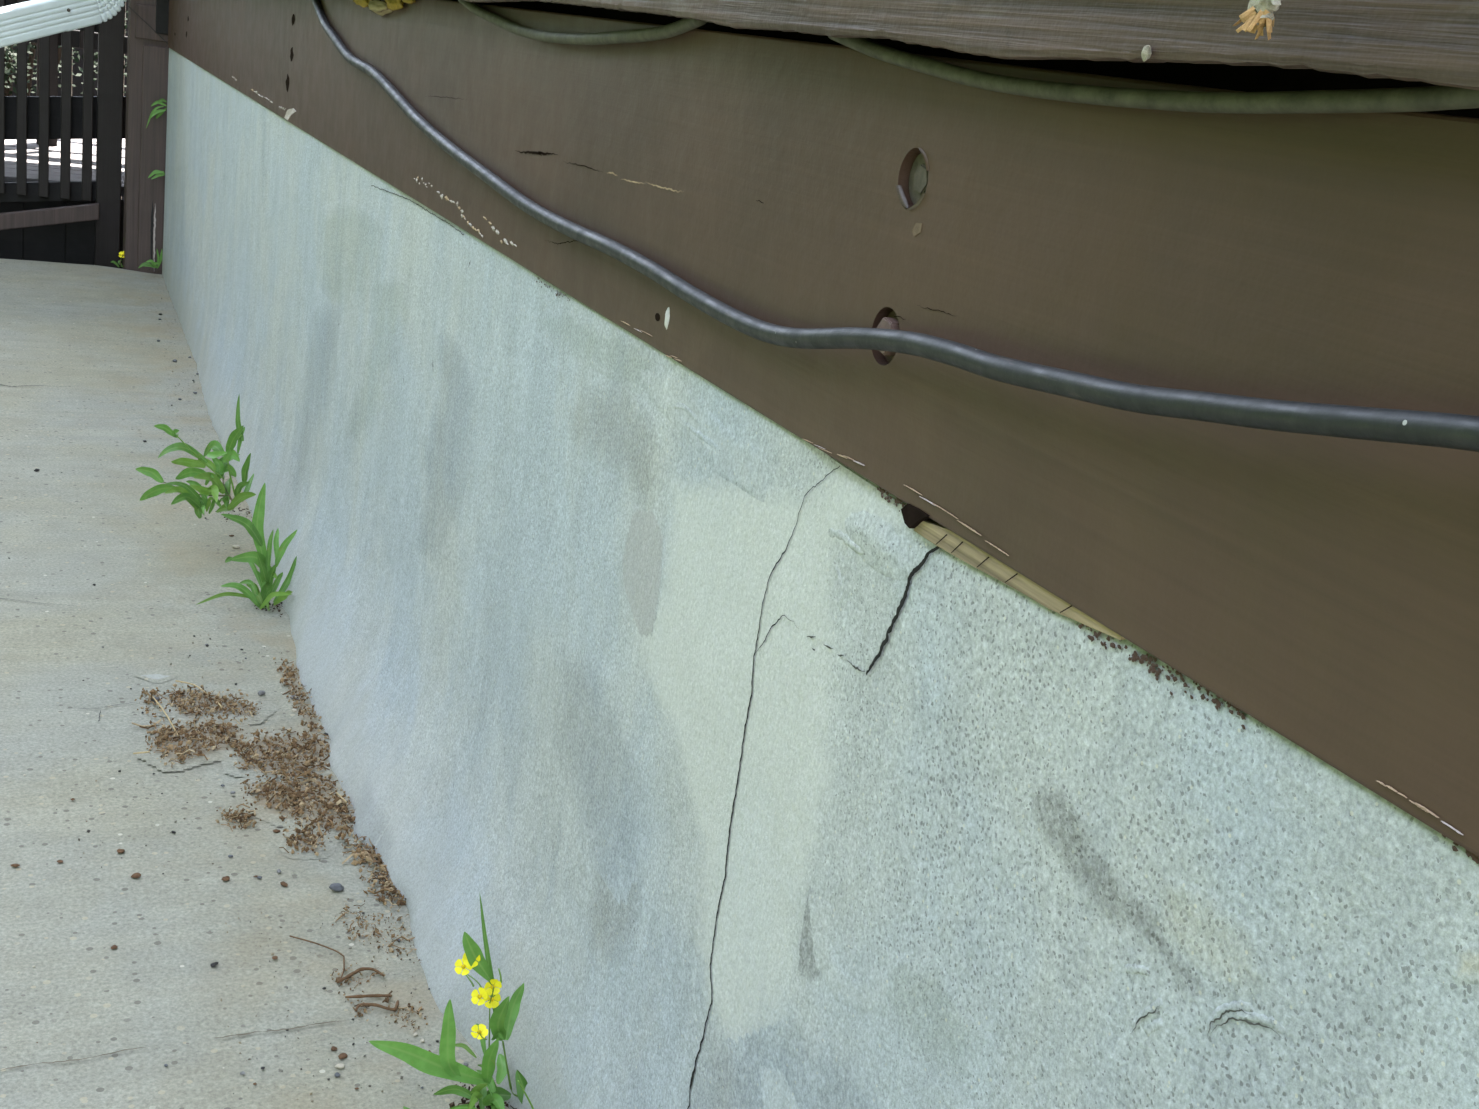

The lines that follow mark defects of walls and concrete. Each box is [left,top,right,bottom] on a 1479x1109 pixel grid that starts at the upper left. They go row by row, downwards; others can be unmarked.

spalling [232,47,296,120]
peeling [414,177,517,247]
spalling [901,485,1009,556]
crack [687,466,940,1109]
peeling [1377,780,1463,835]